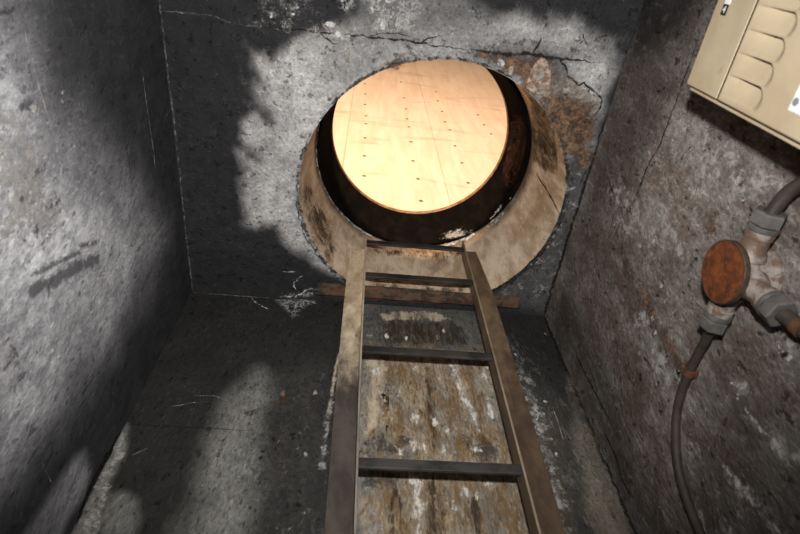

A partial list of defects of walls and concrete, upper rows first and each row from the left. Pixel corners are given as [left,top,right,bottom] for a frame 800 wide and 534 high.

corrosion [480,52,535,95]
corrosion [503,117,525,187]
corrosion [539,94,596,170]
crack [608,32,700,243]
crack [159,6,637,534]